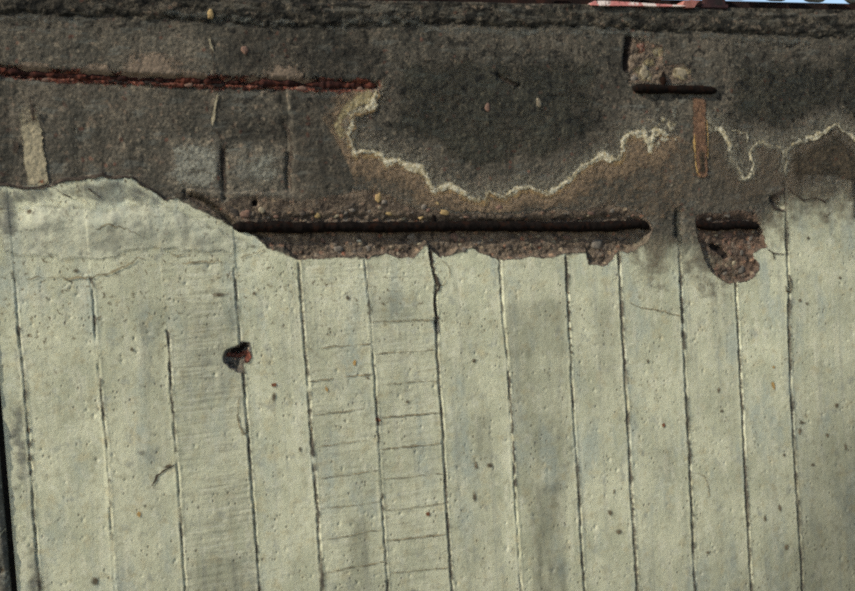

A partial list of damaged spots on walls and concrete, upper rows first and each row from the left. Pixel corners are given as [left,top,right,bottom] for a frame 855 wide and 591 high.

corrosion [0,52,382,95]
damp [394,61,597,166]
corrosion [693,98,709,177]
damp [706,56,855,203]
damp [323,84,693,273]
spalling [175,189,653,267]
spalling [696,209,767,284]
crack [308,247,450,384]
spalling [223,341,252,374]